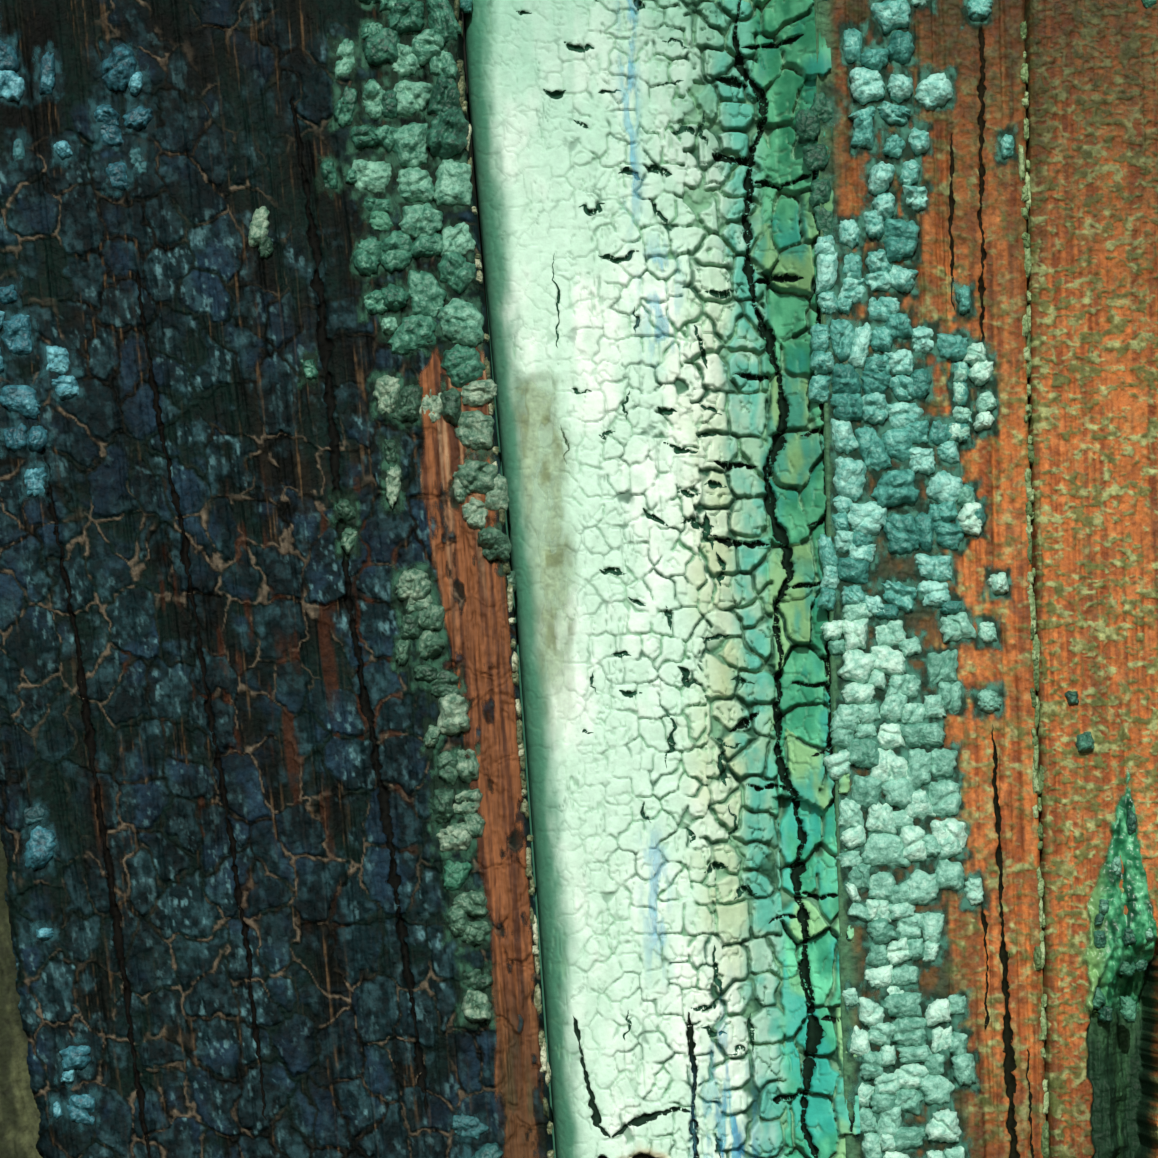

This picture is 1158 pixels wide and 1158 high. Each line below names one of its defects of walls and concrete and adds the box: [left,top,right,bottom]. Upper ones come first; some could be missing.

peeling [0,30,64,109]
crack [598,250,639,263]
crack [619,164,672,231]
peeling [0,275,85,505]
peeling [994,21,1045,851]
peeling [315,0,555,1158]
crack [590,650,642,698]
crack [599,567,672,630]
crack [643,0,847,1158]
peeling [795,0,1012,1158]
peeling [1083,771,1157,1023]
crack [573,945,755,1158]